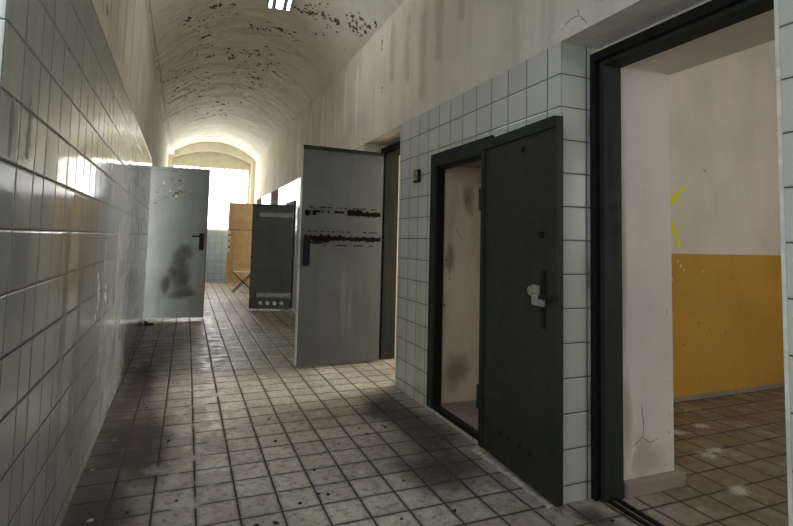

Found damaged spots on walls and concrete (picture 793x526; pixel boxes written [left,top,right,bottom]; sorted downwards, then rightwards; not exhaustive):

peeling [183,3,280,93]
peeling [293,2,377,37]
water stain [387,0,483,105]